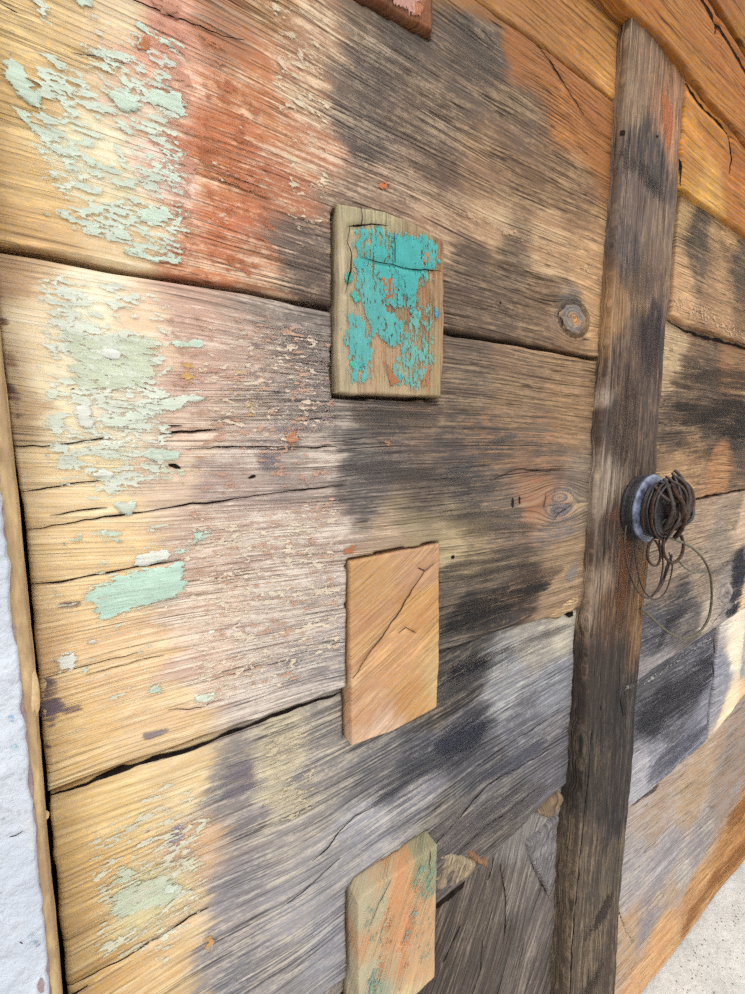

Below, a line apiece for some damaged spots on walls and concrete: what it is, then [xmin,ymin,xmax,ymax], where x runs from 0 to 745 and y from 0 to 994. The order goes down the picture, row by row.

peeling [393,0,419,17]
crack [701,0,745,72]
peeling [2,52,85,156]
peeling [341,226,441,391]
peeling [61,328,205,390]
crack [16,438,104,447]
peeling [73,390,204,429]
crack [159,425,343,450]
crack [19,480,101,492]
crack [25,485,338,531]
peeling [84,530,211,620]
crack [42,564,433,796]